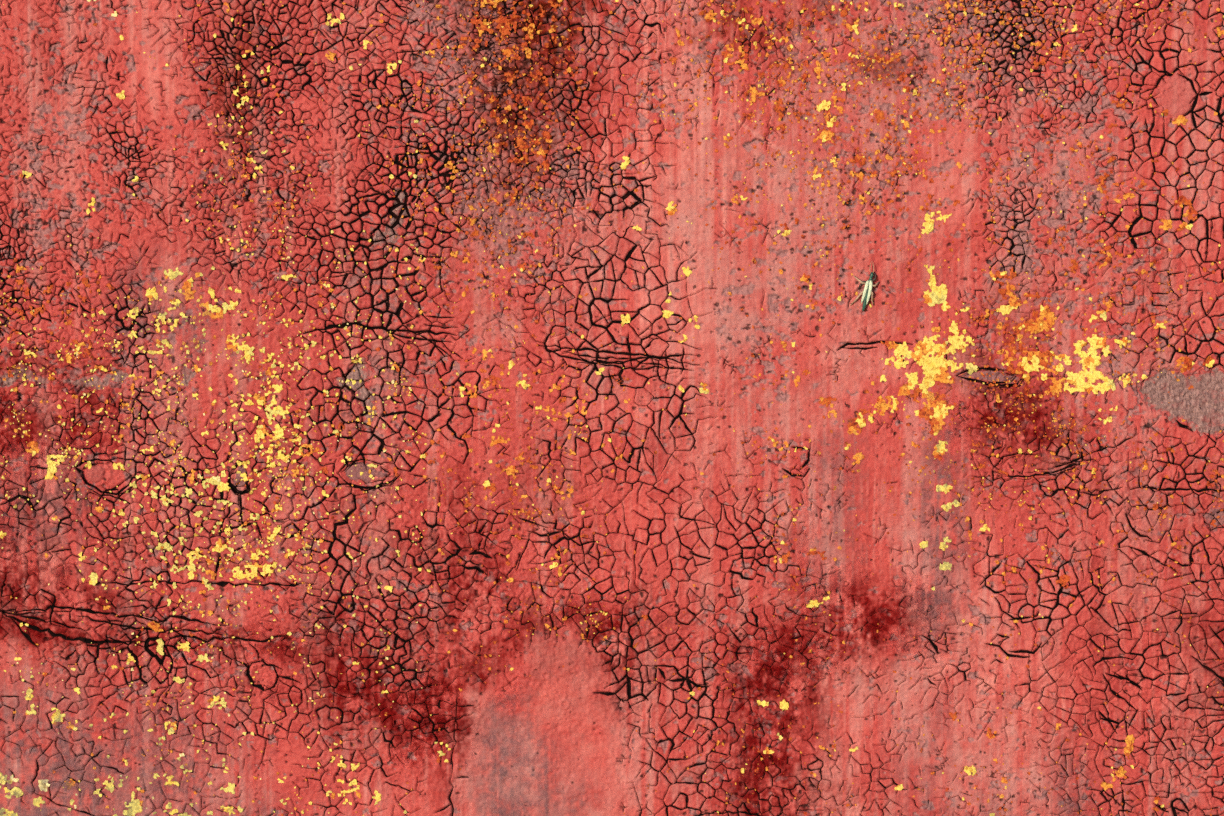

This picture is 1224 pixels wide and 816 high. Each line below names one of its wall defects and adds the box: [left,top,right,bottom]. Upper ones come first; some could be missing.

corrosion [386,0,598,282]
corrosion [622,0,1224,337]
peeling [1155,109,1218,130]
corrosion [745,308,811,405]
spalling [819,154,1224,660]
corrosion [733,420,821,496]
corrosion [763,494,858,584]
peeling [773,581,845,659]
peeling [667,687,725,773]
peeling [697,643,858,815]
peeling [893,755,1013,816]
peeling [1053,714,1170,815]